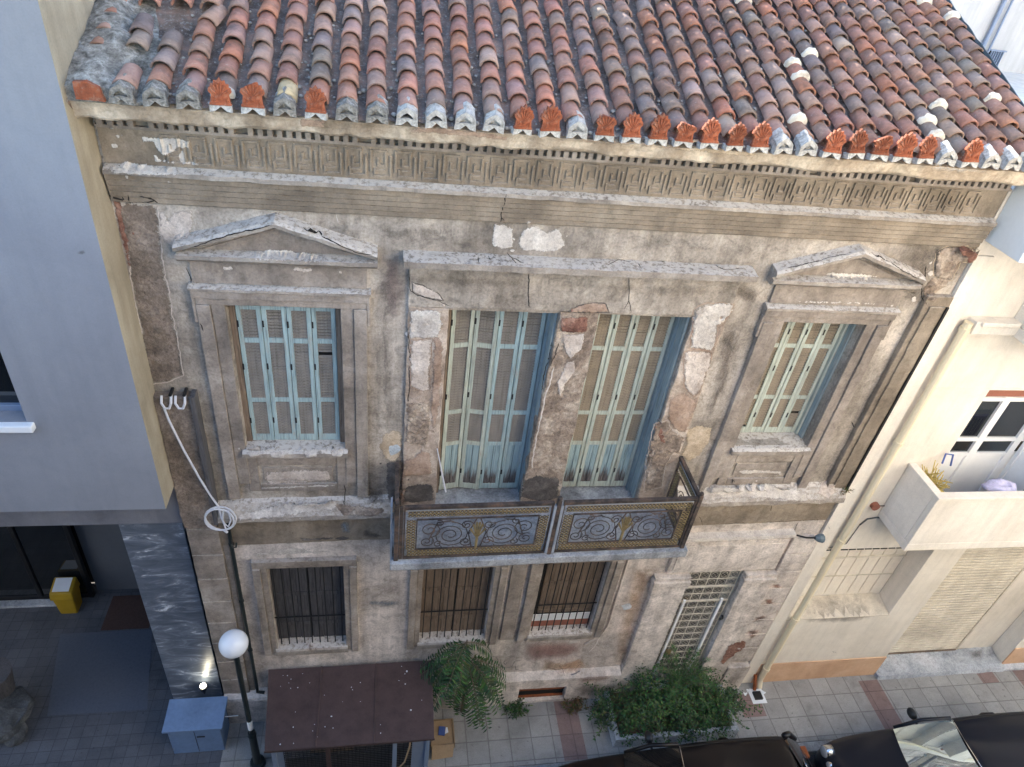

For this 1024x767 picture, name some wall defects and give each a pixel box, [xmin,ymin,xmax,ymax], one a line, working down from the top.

peeling [110,128,199,183]
crack [303,215,371,255]
flaking render [492,219,568,252]
flaking render [911,245,980,302]
flaking render [404,281,448,446]
flaking render [557,302,610,396]
flaking render [644,302,734,492]